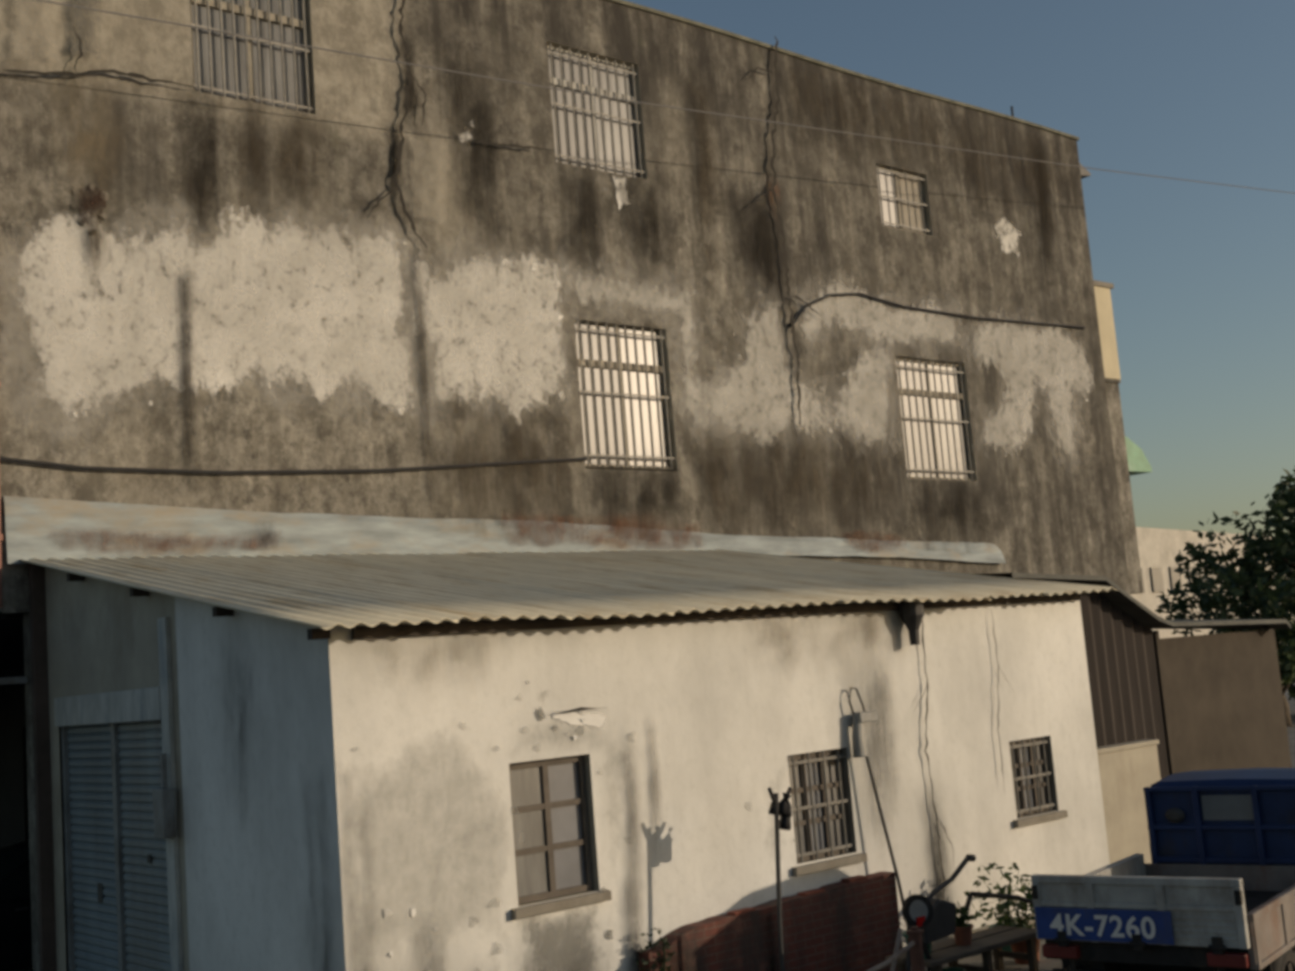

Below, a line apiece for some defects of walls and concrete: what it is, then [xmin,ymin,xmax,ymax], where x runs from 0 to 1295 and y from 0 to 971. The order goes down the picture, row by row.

water stain [183,285,194,459]
crack [366,0,427,248]
peeling [17,184,955,447]
peeling [613,176,628,209]
peeling [995,218,1022,257]
peeling [973,321,1093,453]
peeling [537,707,607,741]
crack [915,620,954,900]